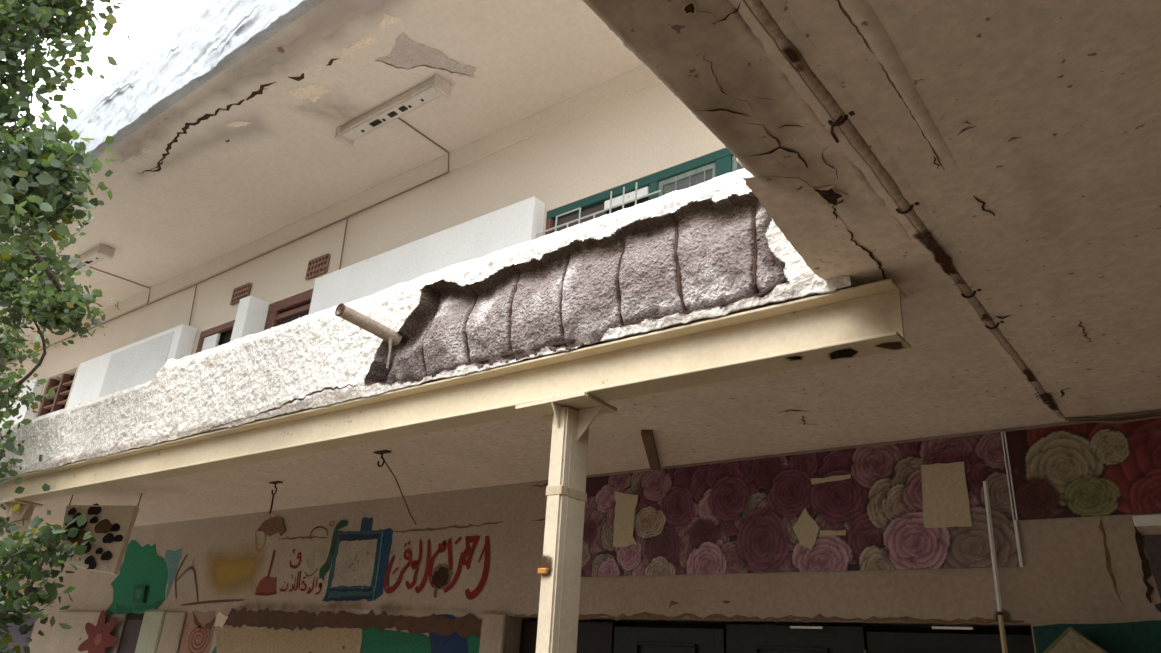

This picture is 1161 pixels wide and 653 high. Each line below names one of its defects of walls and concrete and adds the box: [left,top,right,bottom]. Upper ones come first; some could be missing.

crack [699,2,741,22]
peeling [282,14,477,104]
rust [782,48,803,71]
crack [140,59,337,174]
crack [698,54,886,304]
spalling [364,176,885,386]
rust [914,232,964,284]
rust [830,348,857,360]
rust [876,342,903,350]
rust [1038,394,1058,410]
crack [1087,519,1154,603]